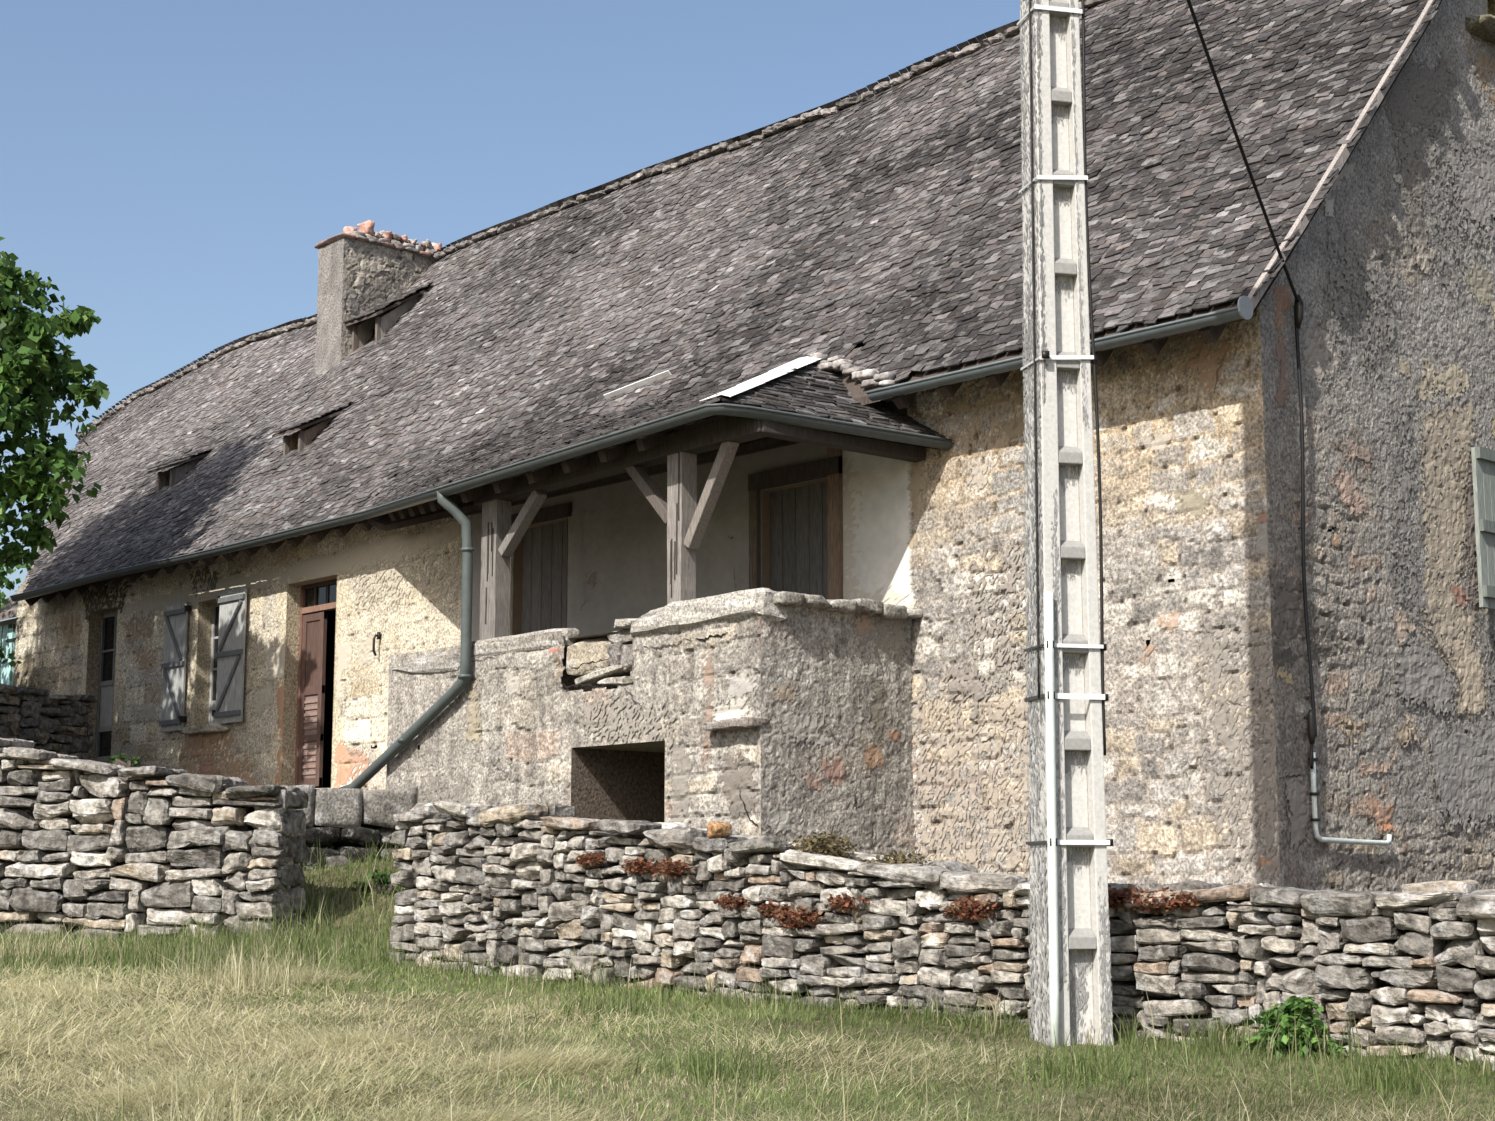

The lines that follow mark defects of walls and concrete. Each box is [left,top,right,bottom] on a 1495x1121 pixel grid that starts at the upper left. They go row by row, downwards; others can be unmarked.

flaking render [1380,50,1462,274]
peeling [1394,354,1495,722]